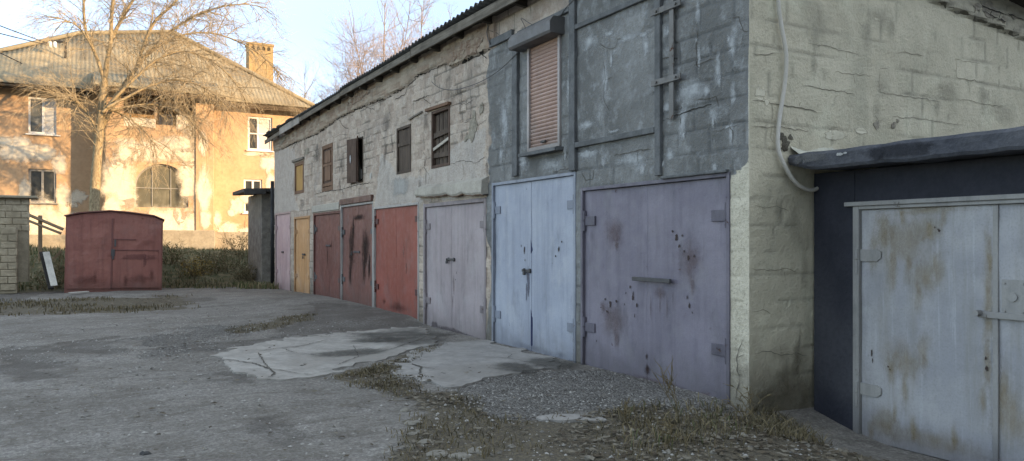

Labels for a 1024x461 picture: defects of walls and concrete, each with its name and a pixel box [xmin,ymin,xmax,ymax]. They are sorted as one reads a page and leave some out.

crack [284,29,498,169]
crack [663,39,1002,142]
flaking render [0,136,88,235]
flaking render [101,127,252,232]
flaking render [245,133,288,188]
water stain [349,215,370,282]